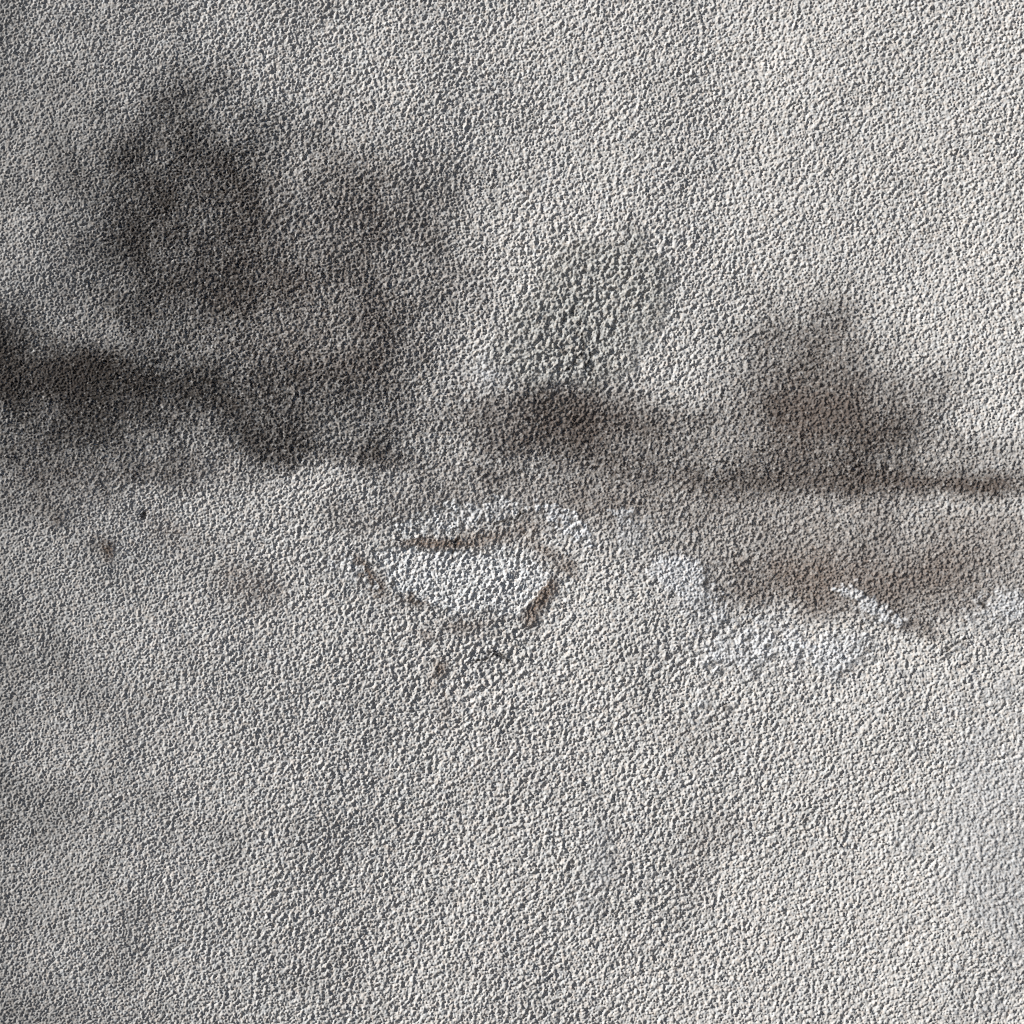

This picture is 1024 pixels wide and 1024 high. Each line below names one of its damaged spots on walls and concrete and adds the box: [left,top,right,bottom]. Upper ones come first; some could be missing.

spalling [315,493,592,621]